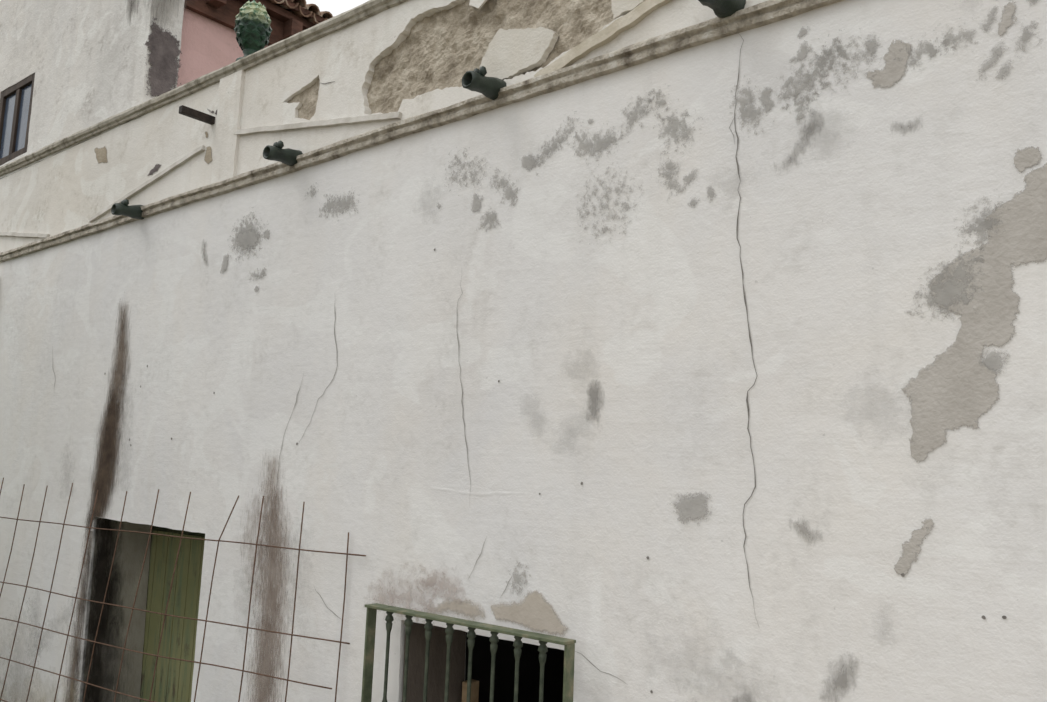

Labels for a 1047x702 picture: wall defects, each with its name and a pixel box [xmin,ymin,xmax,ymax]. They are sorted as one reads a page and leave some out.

spalling [367,0,645,114]
crack [276,306,338,488]
crack [457,334,471,489]
crack [729,33,759,626]
peeling [902,146,1047,462]
damp [65,307,129,702]
peeling [378,562,567,635]
peeling [894,519,934,577]